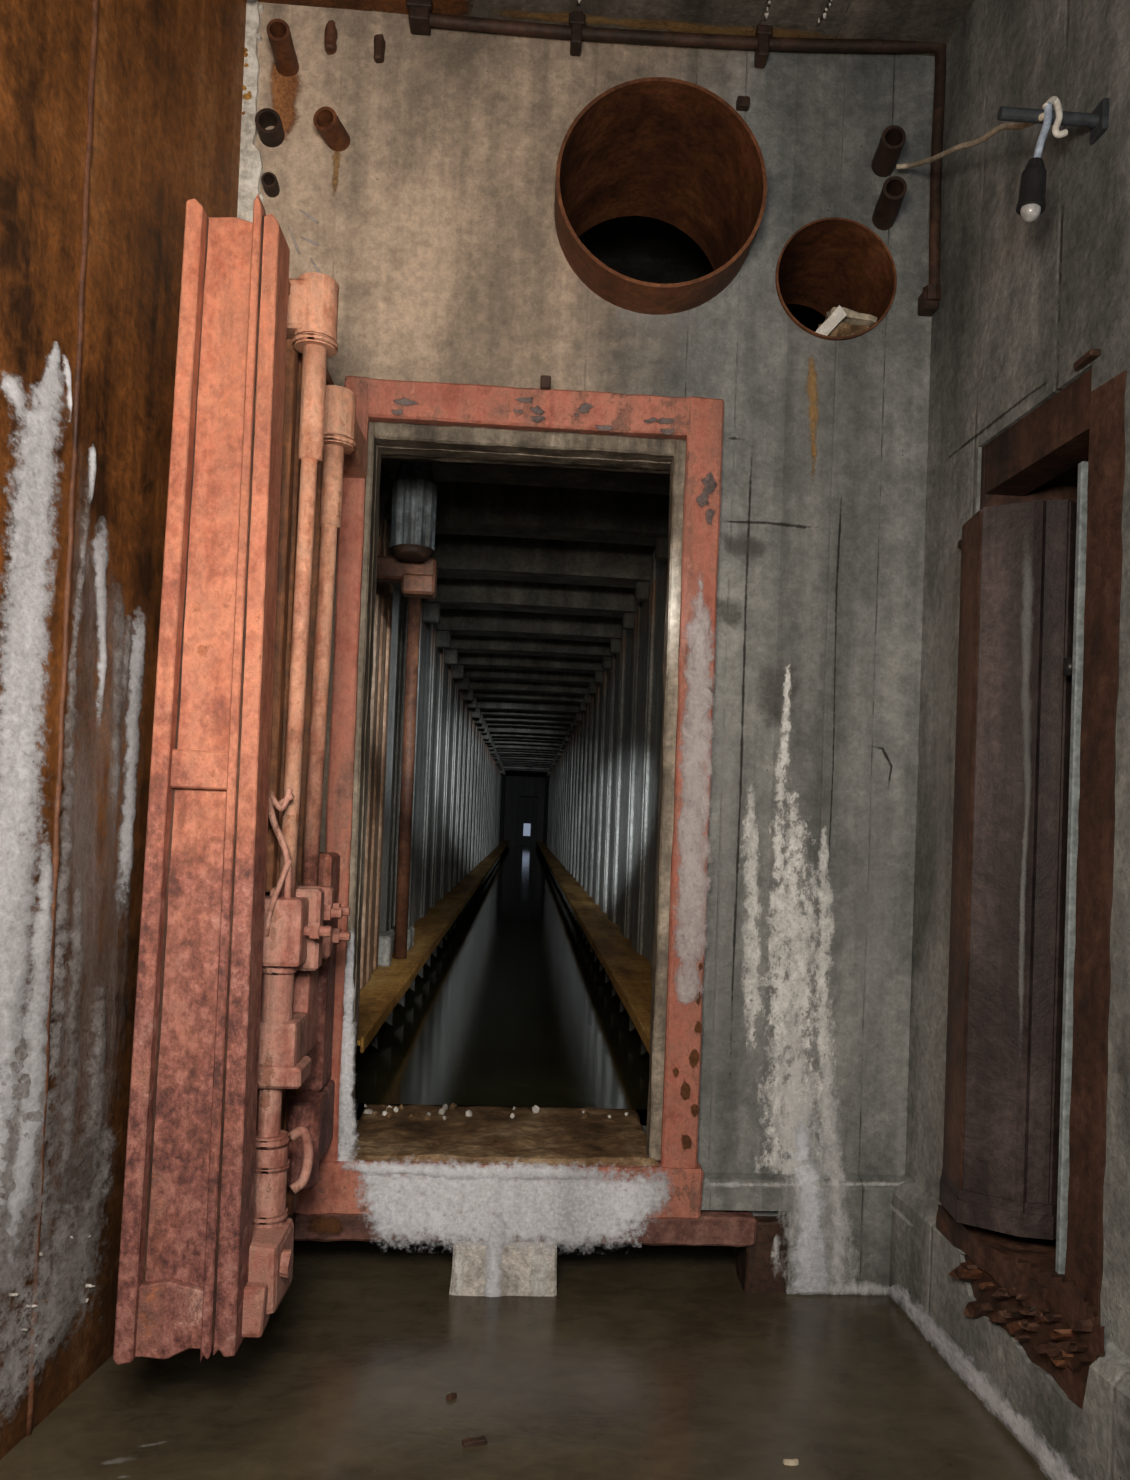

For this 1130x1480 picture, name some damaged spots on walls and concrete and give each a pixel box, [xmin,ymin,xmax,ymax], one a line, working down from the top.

rust [270,62,300,141]
rust [332,151,340,192]
peeling [696,472,717,524]
leakage [0,343,145,1416]
peeling [673,580,714,1117]
leakage [738,664,890,1295]
leakage [337,933,670,1297]
peeling [681,1135,692,1149]
rust [135,1278,203,1359]
spalling [948,1254,1105,1409]